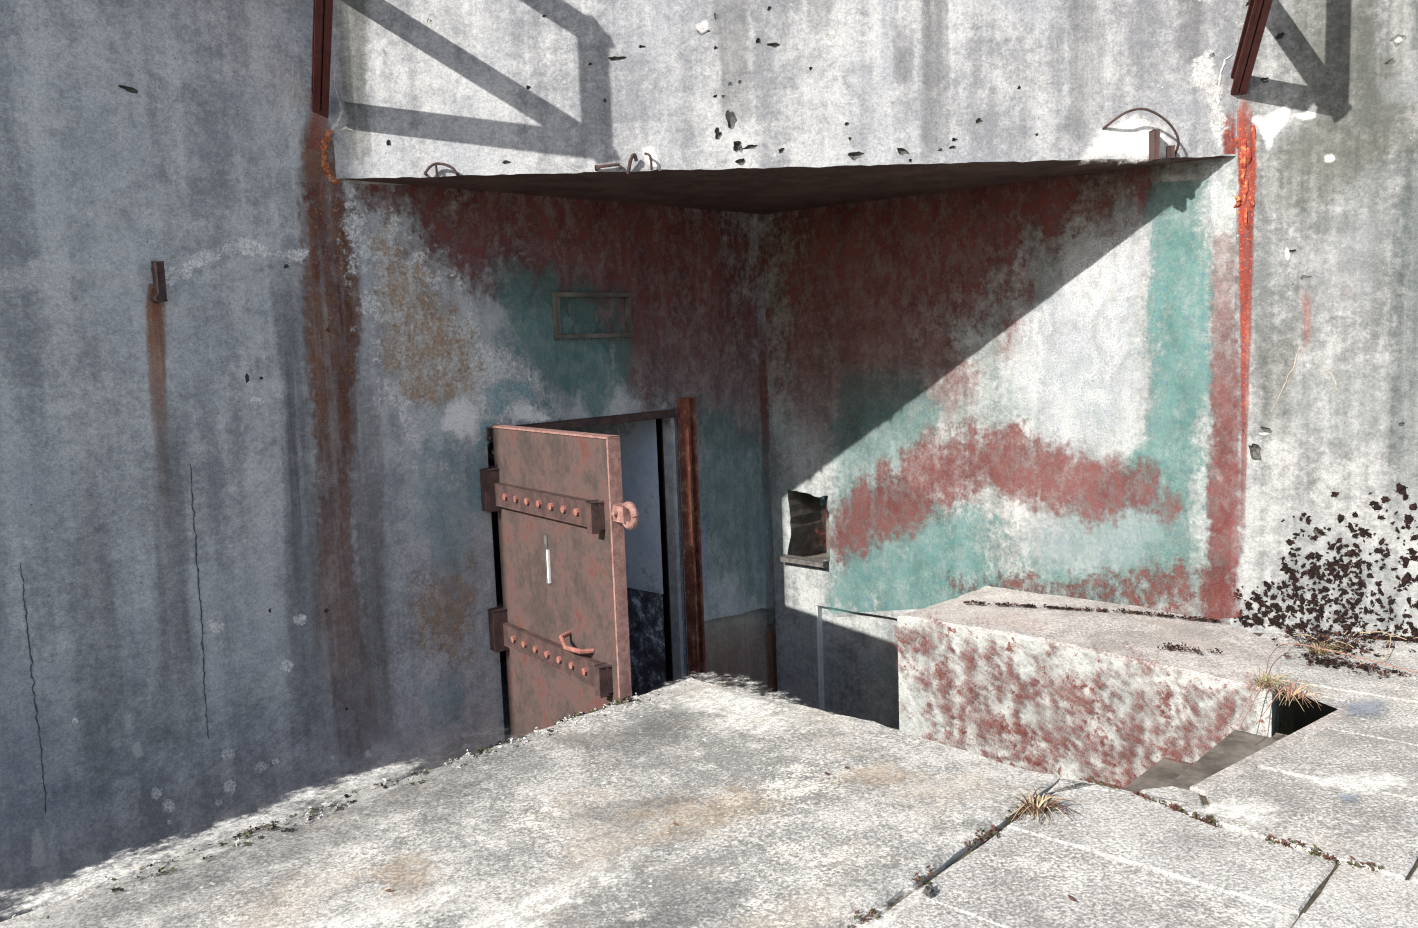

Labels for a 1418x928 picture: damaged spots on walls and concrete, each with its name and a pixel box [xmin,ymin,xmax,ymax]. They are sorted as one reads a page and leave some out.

spalling [697,13,718,50]
spalling [713,80,758,165]
spalling [845,122,865,161]
corrosion [1222,110,1256,454]
corrosion [147,283,165,382]
corrosion [297,95,363,653]